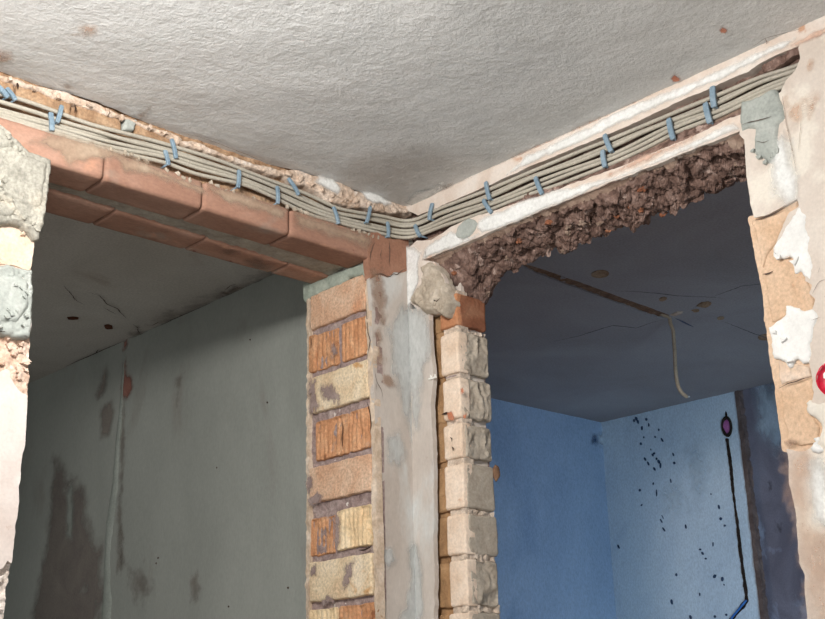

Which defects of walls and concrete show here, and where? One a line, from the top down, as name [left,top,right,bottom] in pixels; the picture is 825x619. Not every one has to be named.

flaking render [0,48,800,243]
flaking render [0,337,32,398]
flaking render [0,226,34,270]
flaking render [748,201,822,452]
flaking render [0,564,10,619]
peeling [34,462,103,619]